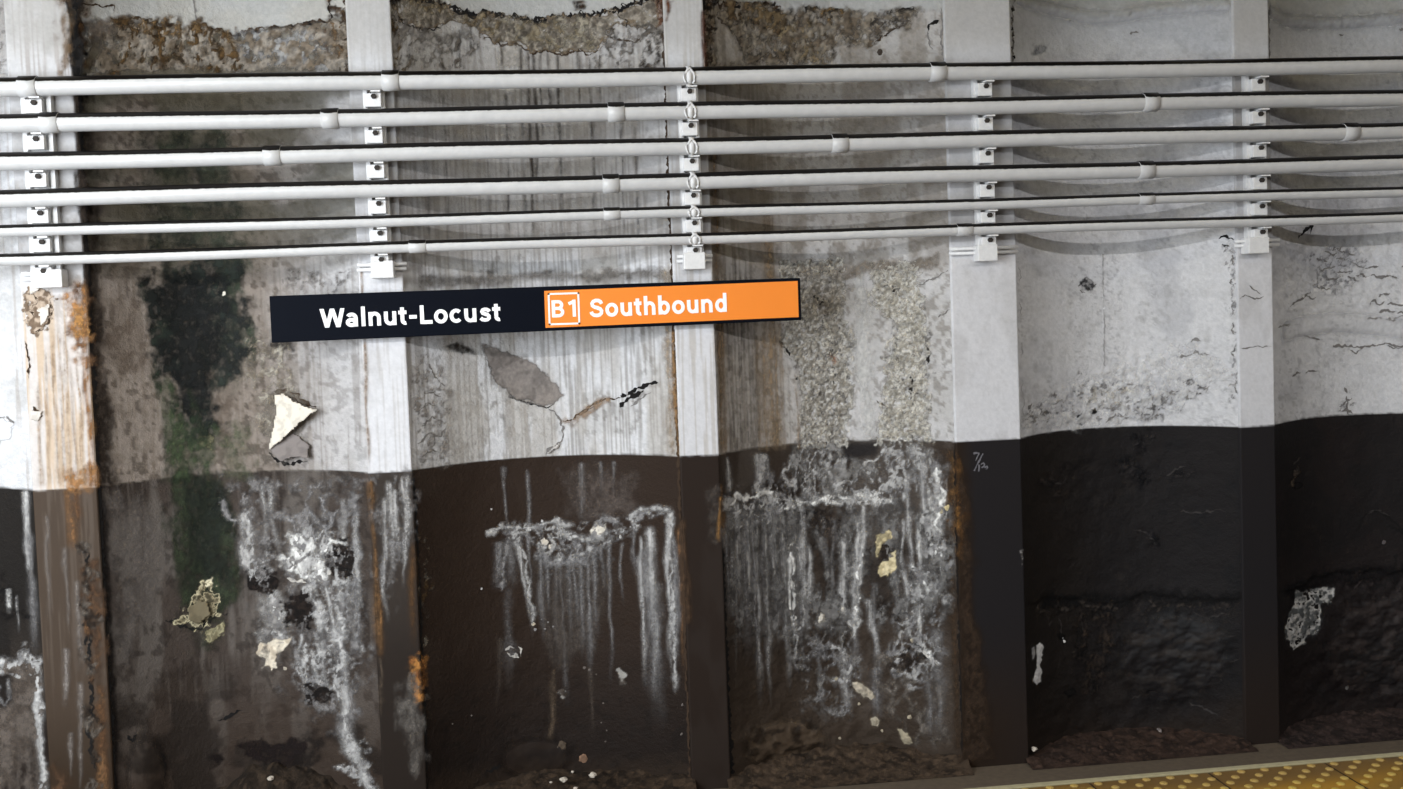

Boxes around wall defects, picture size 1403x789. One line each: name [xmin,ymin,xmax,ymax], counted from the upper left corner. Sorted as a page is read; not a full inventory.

spalling [84,0,348,76]
spalling [390,0,665,71]
peeling [482,344,565,454]
crack [1339,387,1354,416]
crack [1333,343,1403,354]
rust [38,283,108,789]
peeling [165,579,227,643]
water stain [221,475,415,789]
rust [367,480,383,686]
rust [409,658,426,703]
efflorescence [481,463,680,739]
water stain [717,321,955,744]